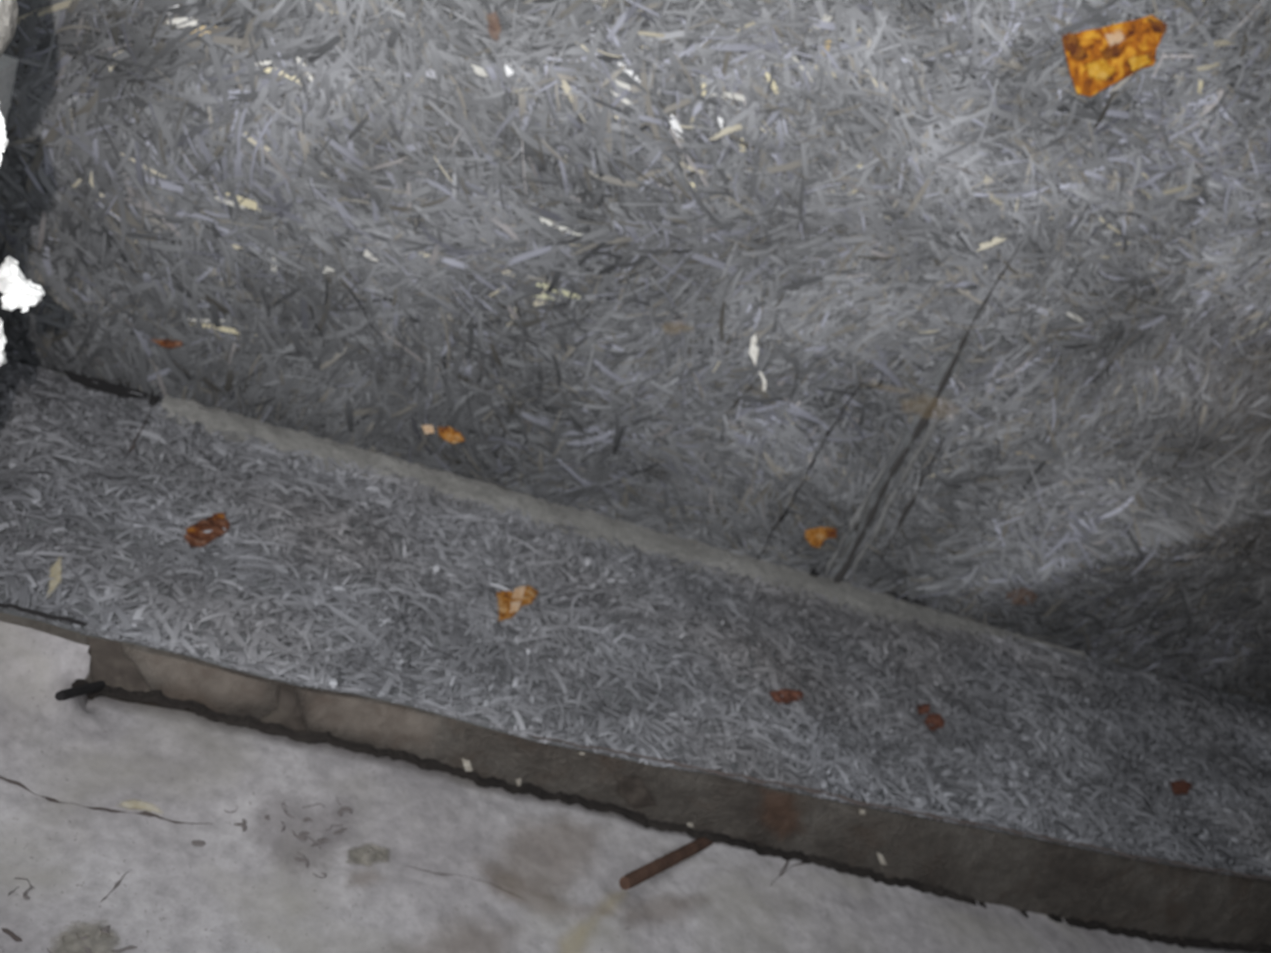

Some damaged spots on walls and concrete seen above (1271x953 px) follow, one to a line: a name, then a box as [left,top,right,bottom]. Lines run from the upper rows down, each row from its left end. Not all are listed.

corrosion [1062,15,1167,97]
corrosion [184,513,230,547]
corrosion [805,527,837,548]
corrosion [496,586,538,621]
crack [0,776,214,825]
crack [102,869,131,901]